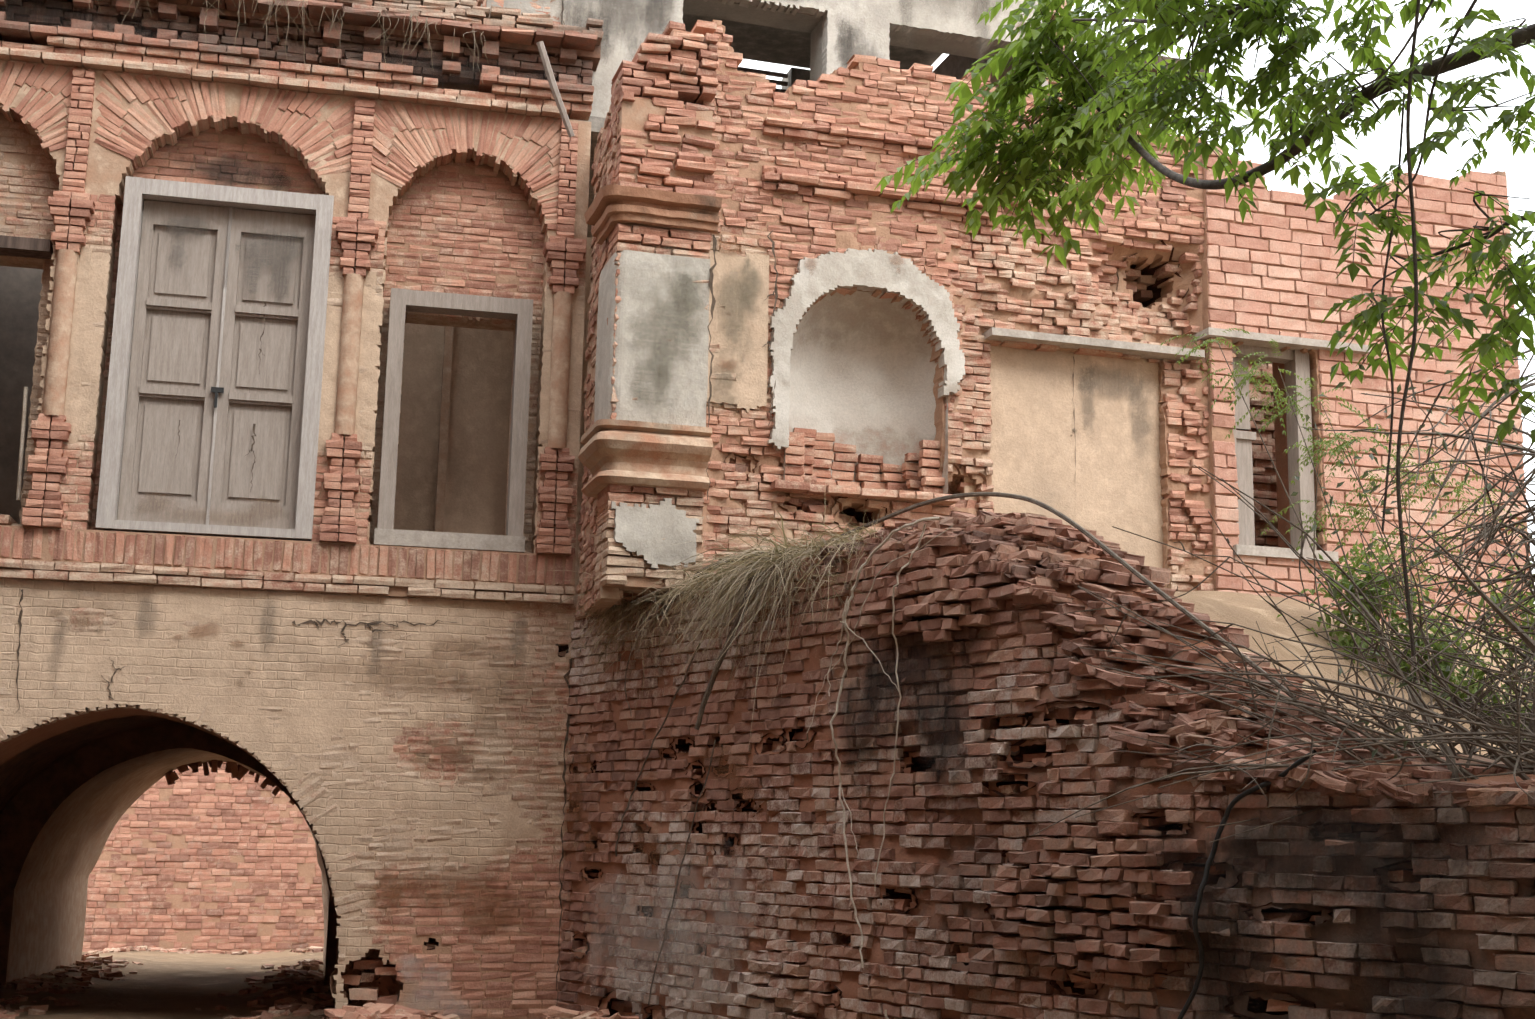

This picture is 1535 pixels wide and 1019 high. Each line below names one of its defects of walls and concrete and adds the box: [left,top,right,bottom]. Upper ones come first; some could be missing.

damp [840,31,860,63]
spalling [1116,240,1189,317]
spalling [725,454,759,473]
spalling [948,464,987,515]
spalling [778,494,887,530]
crack [292,619,457,648]
spalling [754,717,817,755]
spalling [900,750,940,773]
spalling [661,733,763,833]
spalling [713,833,740,856]
spalling [875,884,918,913]
spalling [598,990,668,1019]